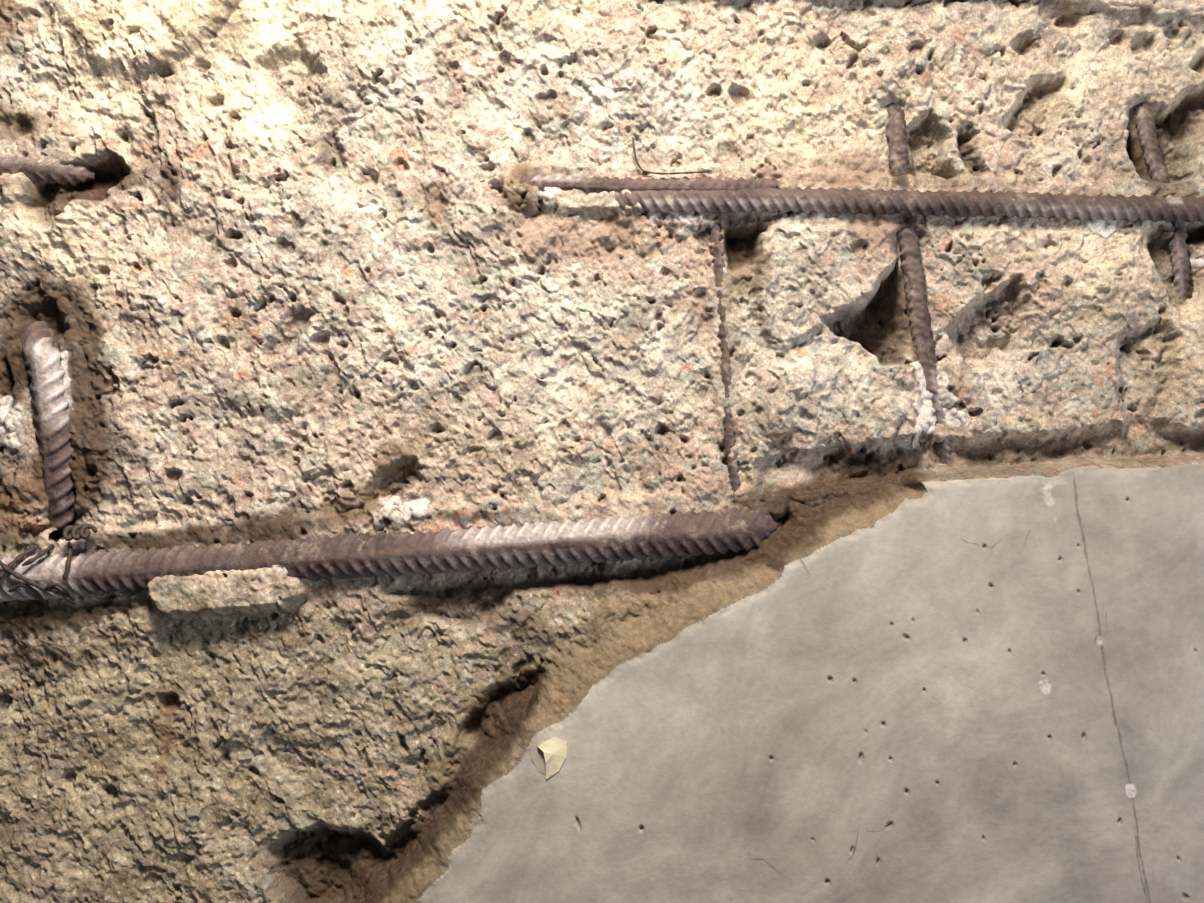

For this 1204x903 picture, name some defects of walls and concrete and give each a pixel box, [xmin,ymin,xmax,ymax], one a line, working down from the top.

crack [208,0,240,39]
corrosion [1130,131,1163,181]
corrosion [1186,230,1204,244]
spalling [0,0,1204,553]
corrosion [0,279,114,520]
corrosion [98,510,309,549]
corrosion [0,598,130,631]
spalling [0,386,798,903]
crack [1073,472,1129,777]
spalling [1039,679,1051,695]
spalling [1125,784,1136,798]
crack [1134,811,1151,903]